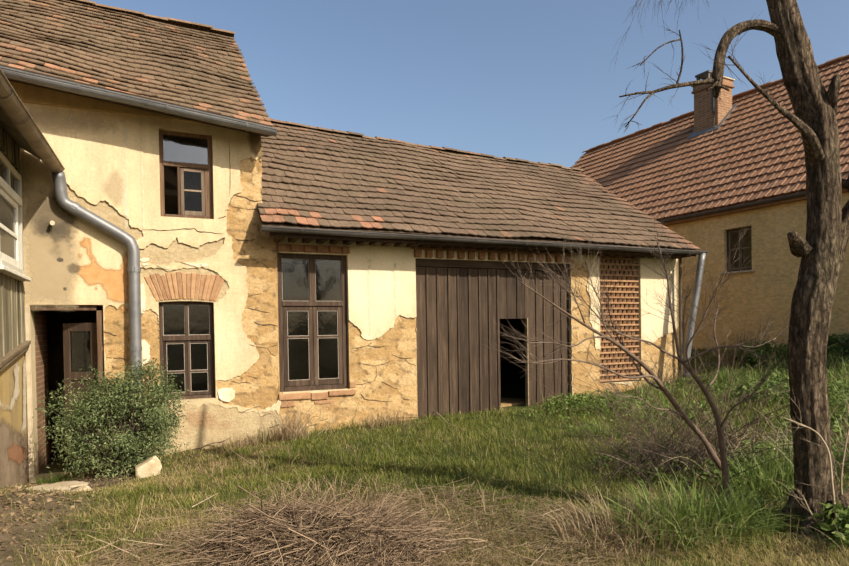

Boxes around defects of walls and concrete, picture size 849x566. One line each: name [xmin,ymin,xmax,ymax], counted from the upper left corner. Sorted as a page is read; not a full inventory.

spalling [67,157,418,457]
spalling [570,260,678,400]